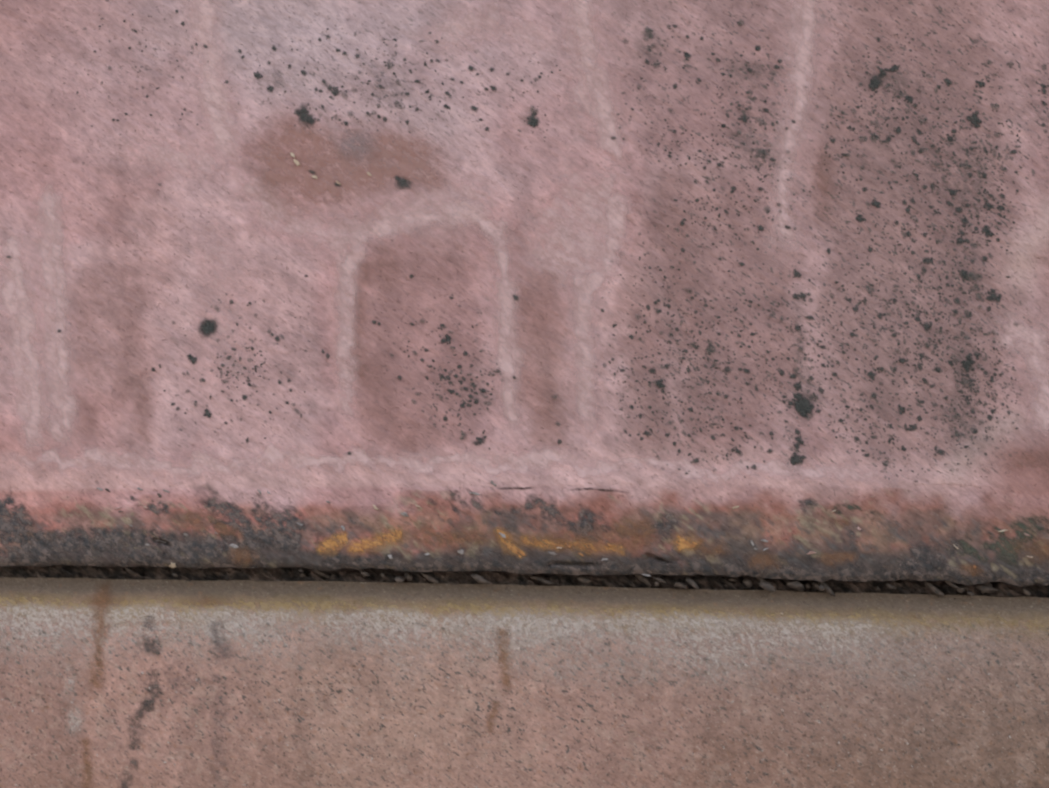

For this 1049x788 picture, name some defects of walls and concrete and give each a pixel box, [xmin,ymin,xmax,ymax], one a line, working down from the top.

damp [147,0,237,171]
damp [283,28,489,131]
damp [512,0,816,283]
damp [0,52,1049,483]
corrosion [318,530,402,552]
corrosion [496,526,646,557]
damp [122,674,160,788]